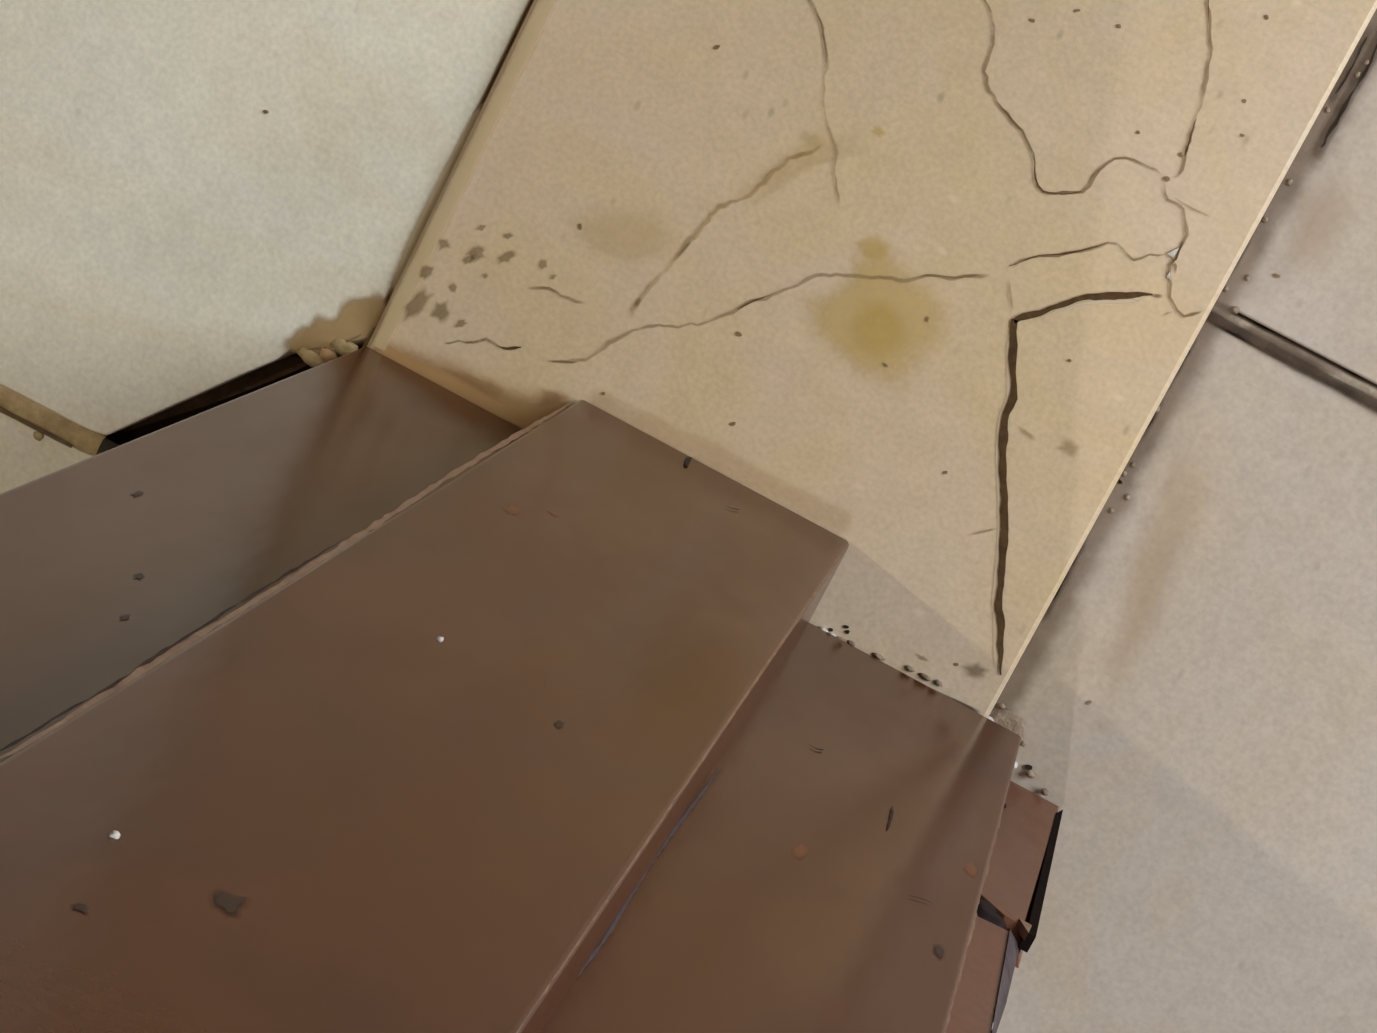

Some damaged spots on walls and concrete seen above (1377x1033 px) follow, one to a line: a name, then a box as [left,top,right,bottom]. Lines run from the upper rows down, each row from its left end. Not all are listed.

crack [535,287,579,303]
crack [450,339,521,350]
crack [553,0,1213,675]